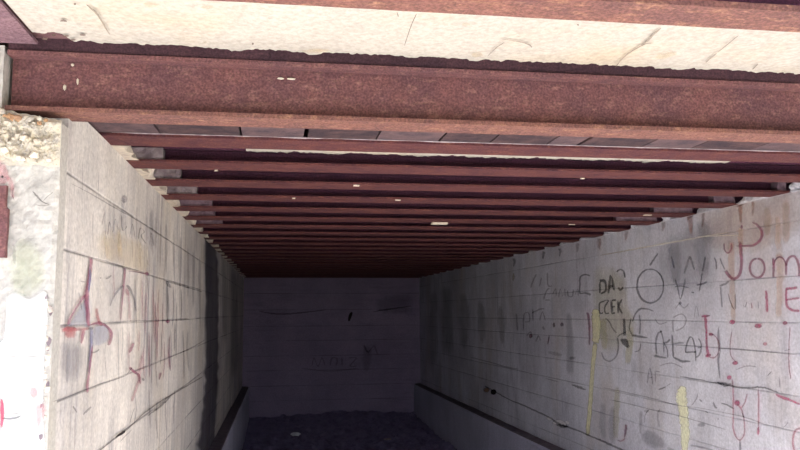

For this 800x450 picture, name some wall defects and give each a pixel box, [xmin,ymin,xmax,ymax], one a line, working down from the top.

spalling [0,108,62,167]
crack [684,377,777,409]